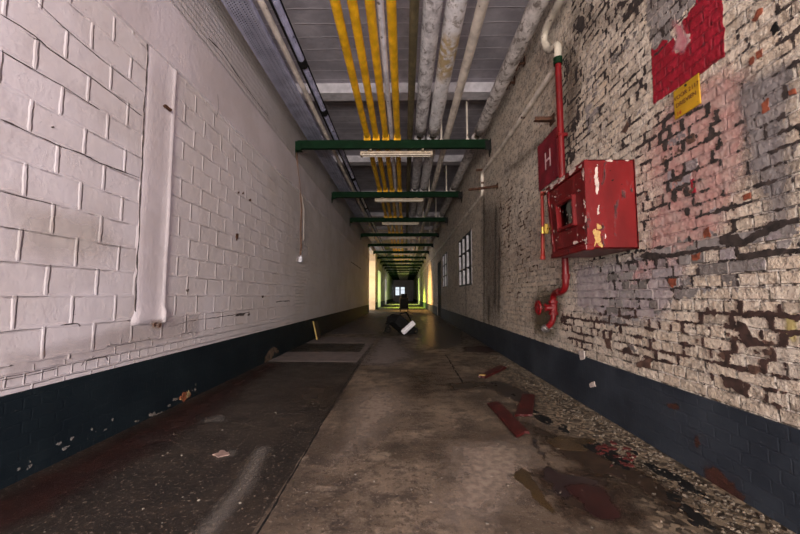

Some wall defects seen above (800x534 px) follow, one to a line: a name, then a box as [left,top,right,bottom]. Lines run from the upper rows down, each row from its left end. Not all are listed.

peeling [561,0,800,397]
peeling [149,384,196,416]
peeling [763,387,788,410]